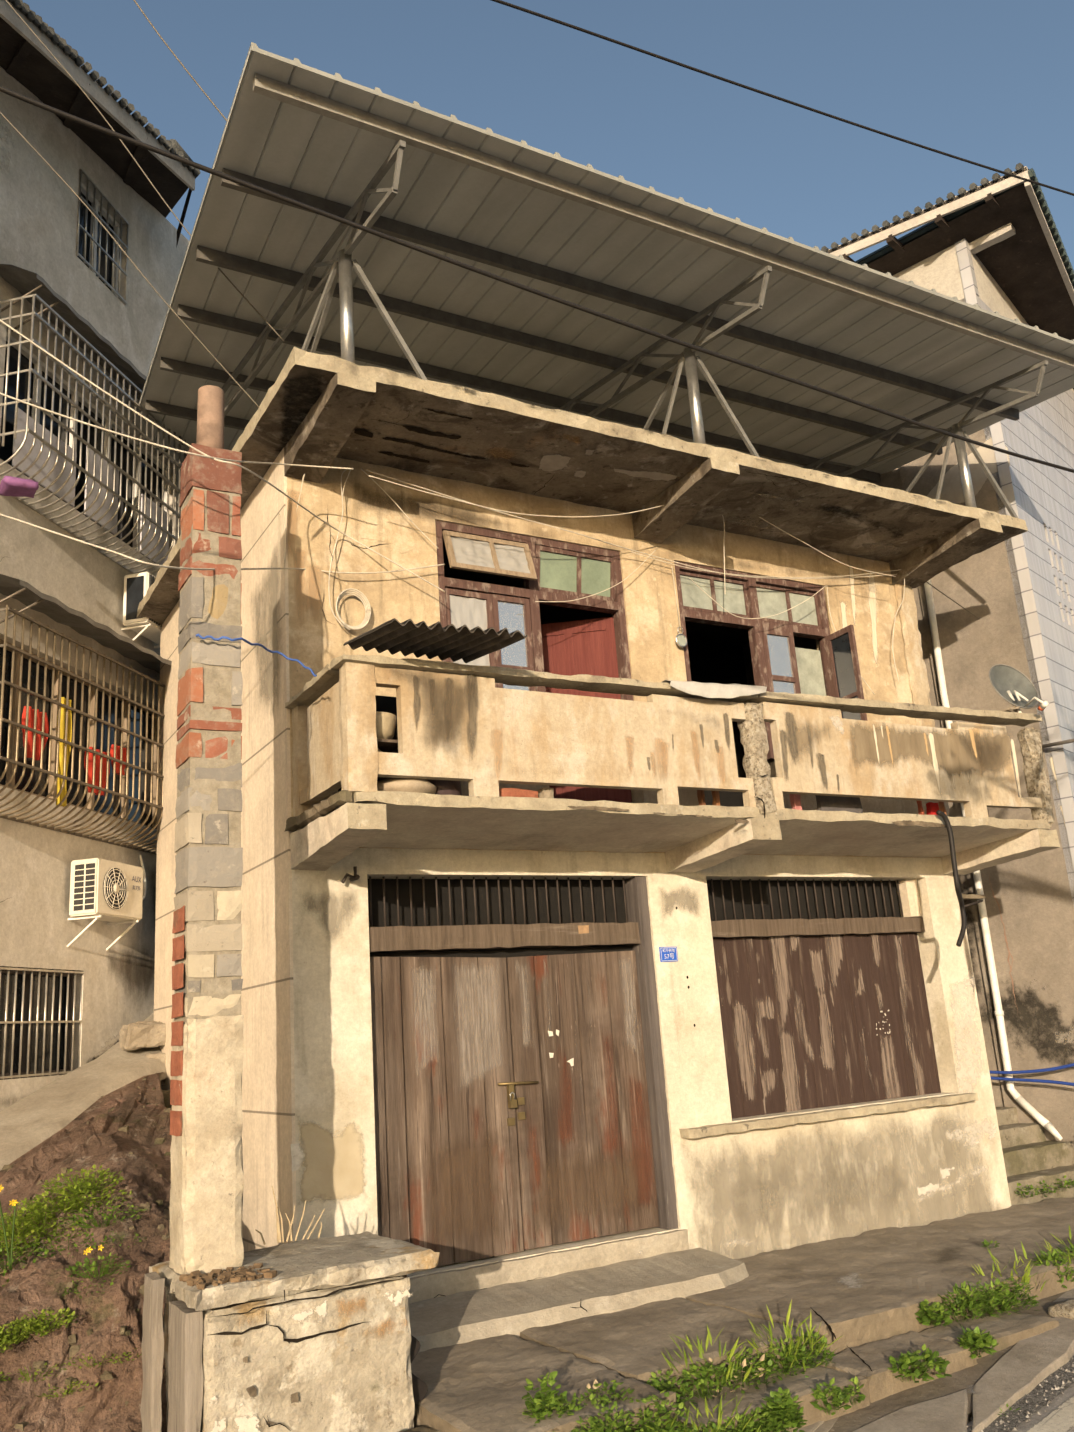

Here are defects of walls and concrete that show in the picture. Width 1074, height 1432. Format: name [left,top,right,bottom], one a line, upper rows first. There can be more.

damp [255,474,305,699]
damp [780,712,1021,798]
peeling [721,934,925,1114]
damp [951,888,1074,1094]
peeling [292,1300,327,1323]
crack [206,1274,445,1343]
peeling [384,1288,411,1306]
peeling [209,1385,276,1432]